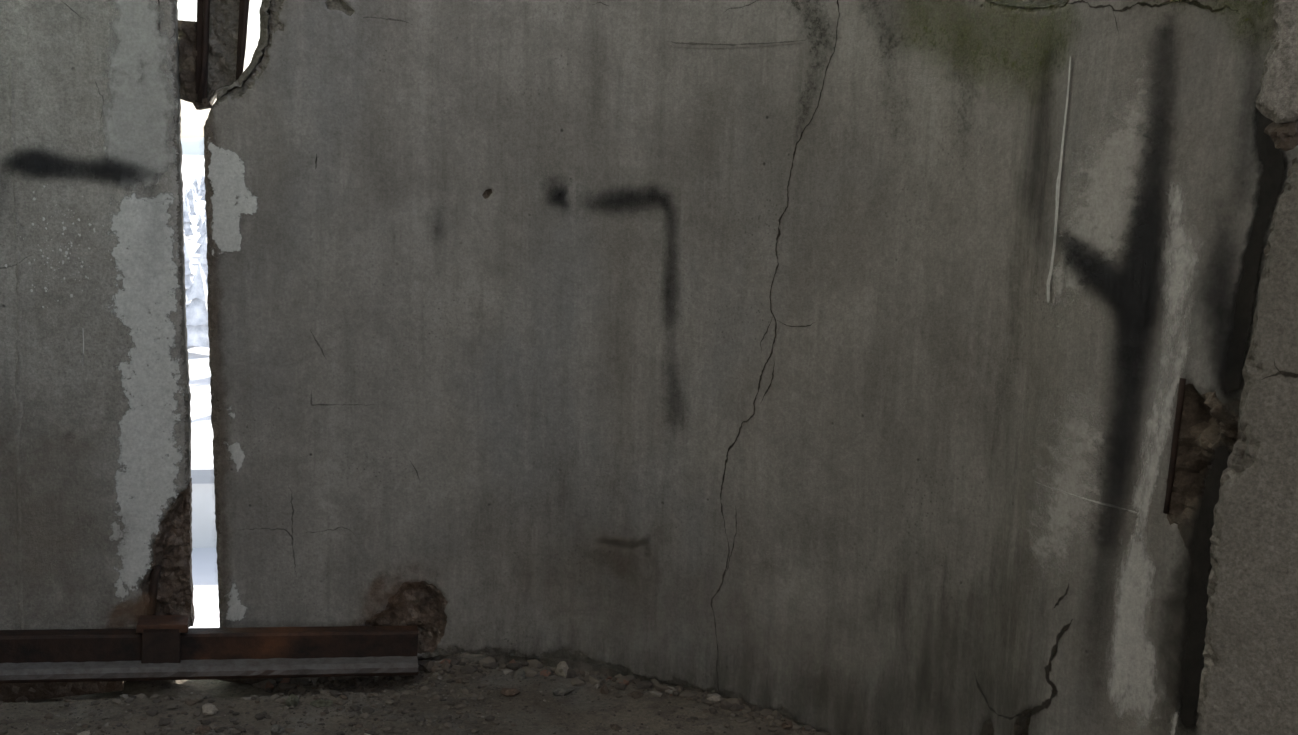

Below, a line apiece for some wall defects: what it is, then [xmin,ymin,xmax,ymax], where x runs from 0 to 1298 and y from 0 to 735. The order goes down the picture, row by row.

spalling [197,0,272,102]
crack [711,0,840,694]
peeling [1163,246,1193,344]
spalling [1163,378,1239,548]
spalling [114,478,195,627]
spalling [365,581,448,654]
crack [974,584,1073,735]